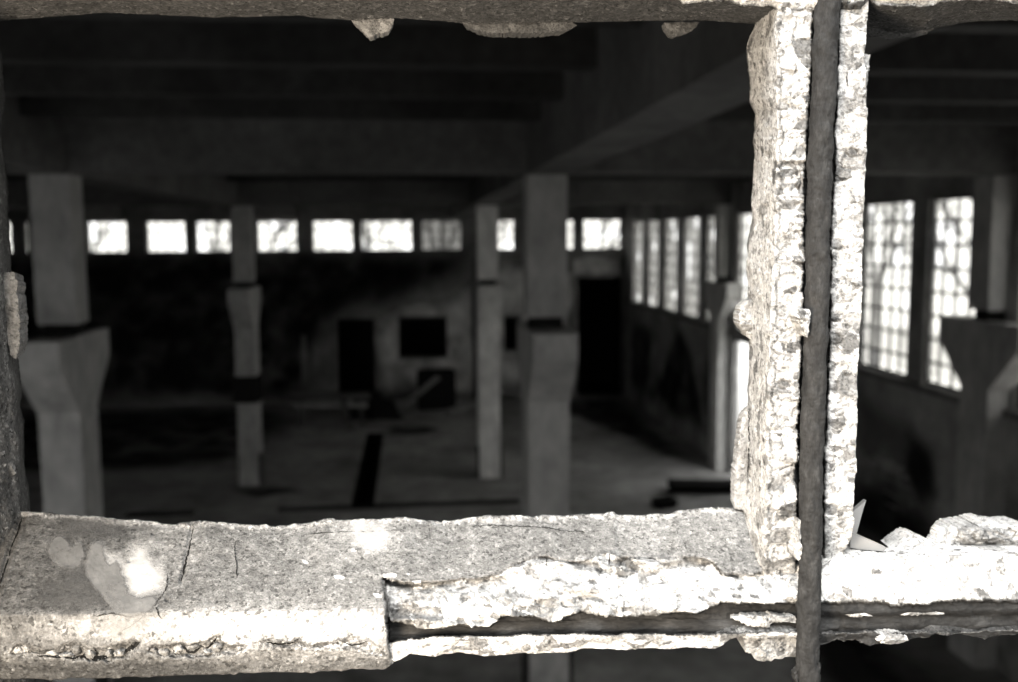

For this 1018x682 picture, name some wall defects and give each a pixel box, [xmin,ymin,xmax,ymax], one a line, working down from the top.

leakage [45,520,163,638]
spalling [378,0,817,662]